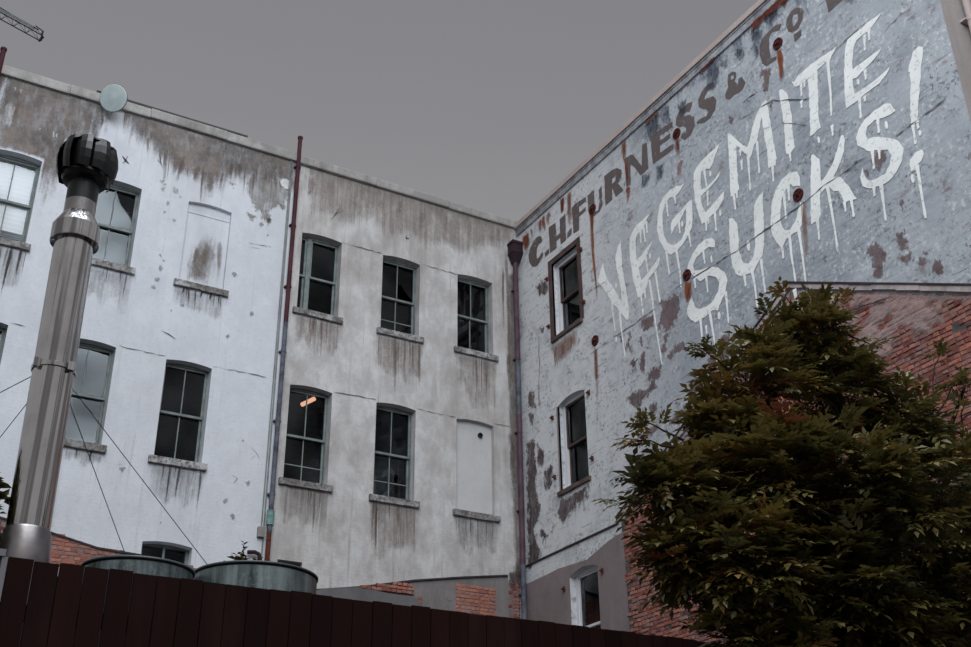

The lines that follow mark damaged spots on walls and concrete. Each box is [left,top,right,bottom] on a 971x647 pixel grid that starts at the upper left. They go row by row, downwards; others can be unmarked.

water stain [0,75,103,177]
water stain [124,112,295,190]
water stain [191,245,221,279]
peeling [619,291,696,457]
flaking render [689,228,971,469]
flaking render [50,534,130,566]
flaking render [456,583,496,616]
peeling [508,391,553,619]
flaking render [615,488,738,645]